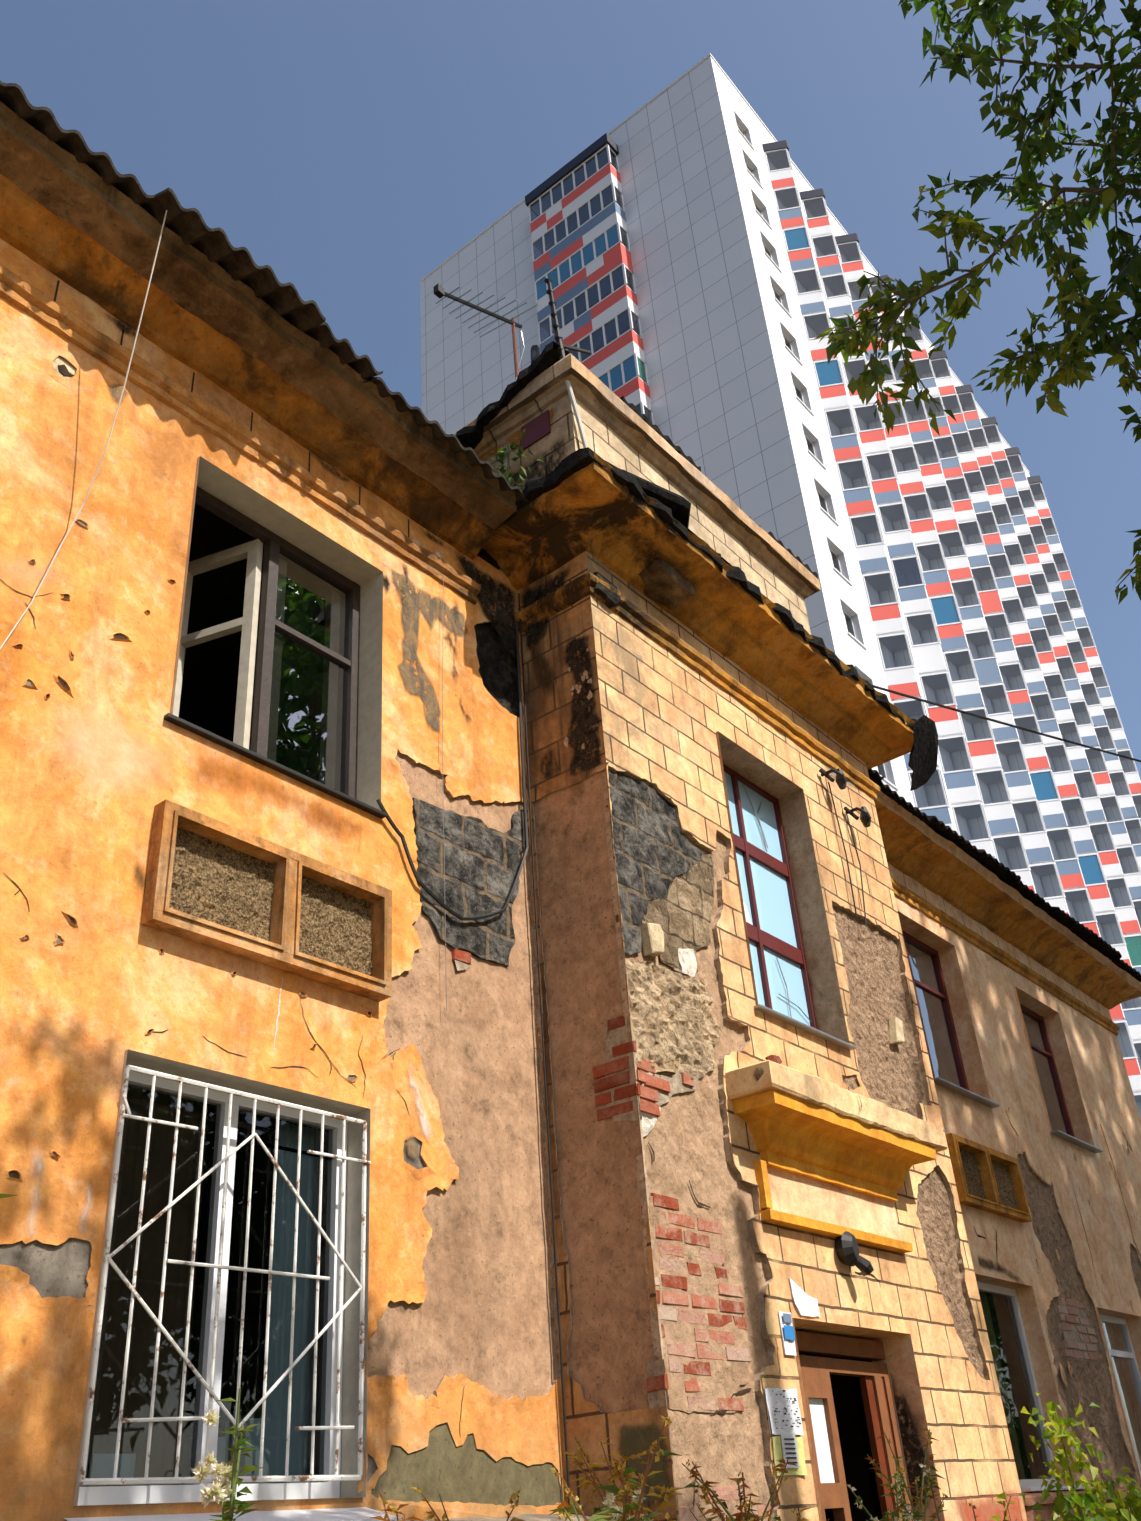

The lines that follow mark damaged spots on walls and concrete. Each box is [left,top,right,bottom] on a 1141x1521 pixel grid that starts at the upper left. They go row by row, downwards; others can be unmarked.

flaking render [467,616,525,723]
peeling [568,667,593,700]
peeling [828,894,934,1120]
spalling [344,1074,358,1084]
flaking render [358,736,785,1521]
flaking render [0,1224,98,1310]
flaking render [1006,1097,1141,1488]